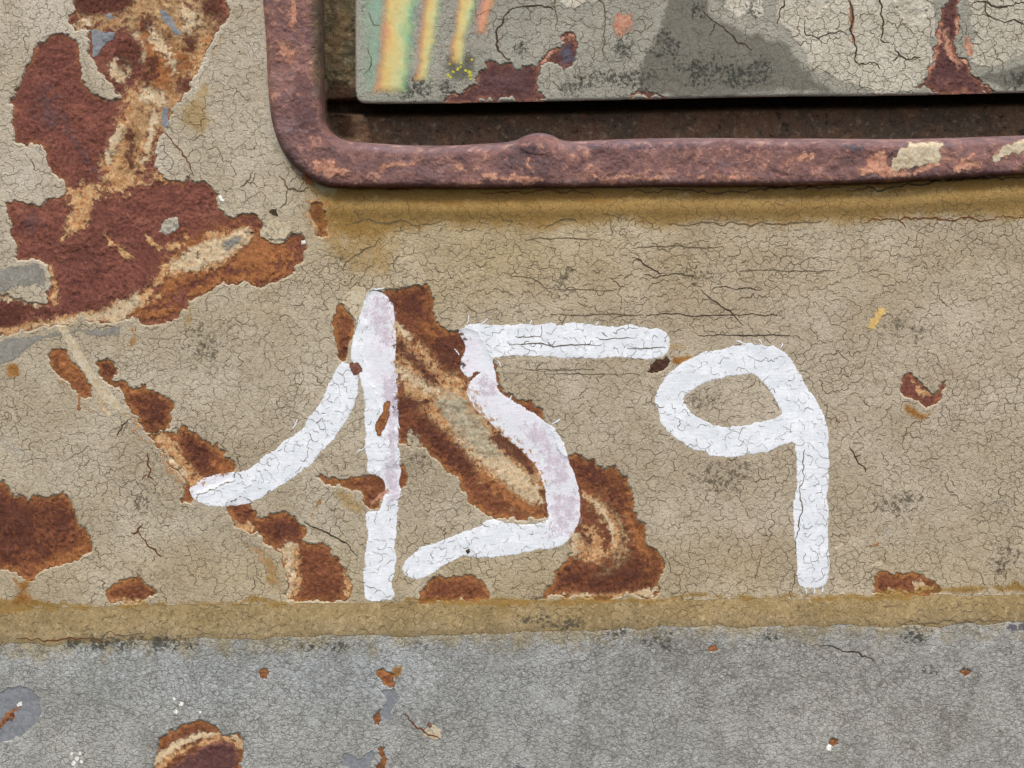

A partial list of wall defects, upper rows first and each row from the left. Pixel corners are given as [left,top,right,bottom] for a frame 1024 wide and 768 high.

crack [0,0,105,304]
rust [0,0,334,337]
crack [156,0,319,237]
peeling [260,208,292,244]
crack [359,0,1024,101]
rust [0,481,93,581]
rust [49,348,236,504]
rust [375,284,549,521]
crack [0,175,1024,768]
rust [540,453,665,602]
leakage [520,610,584,630]
peeling [0,686,42,743]